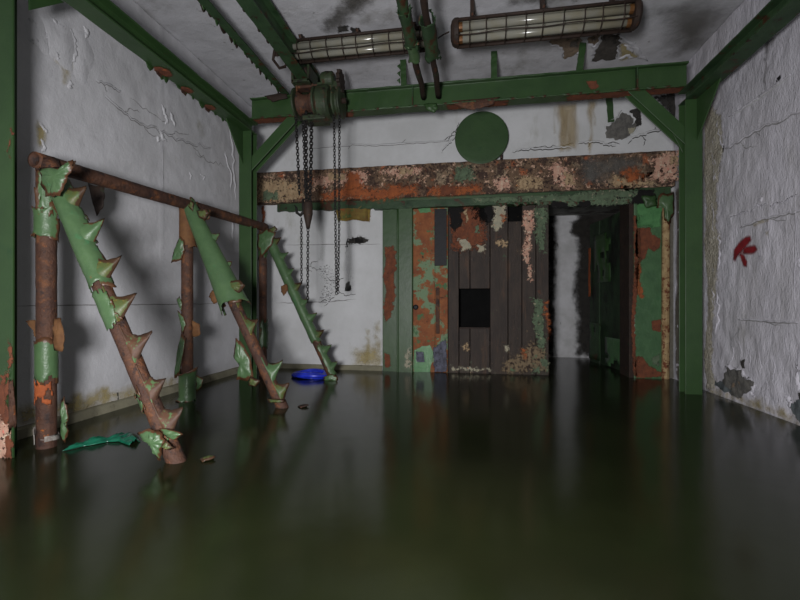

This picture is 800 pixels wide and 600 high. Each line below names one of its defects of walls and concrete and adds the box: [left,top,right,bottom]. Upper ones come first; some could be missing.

flaking render [549,34,648,62]
crack [96,79,223,166]
flaking render [604,108,642,140]
rust [319,171,479,221]
rust [382,246,397,321]
peeling [704,105,776,398]